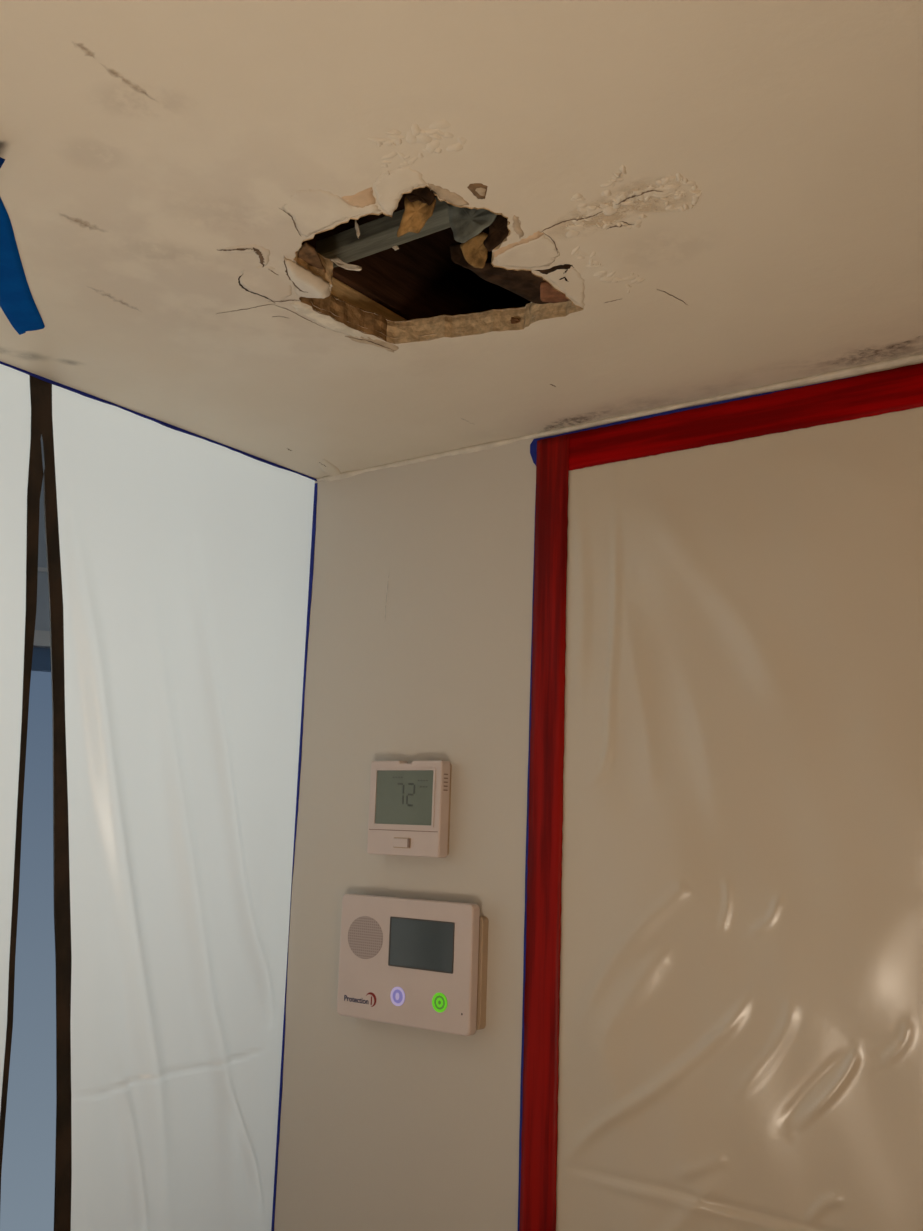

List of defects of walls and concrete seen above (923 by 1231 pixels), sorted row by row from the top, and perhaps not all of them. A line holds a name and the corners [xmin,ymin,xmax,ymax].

crack [217,247,396,351]
flaking render [222,167,585,353]